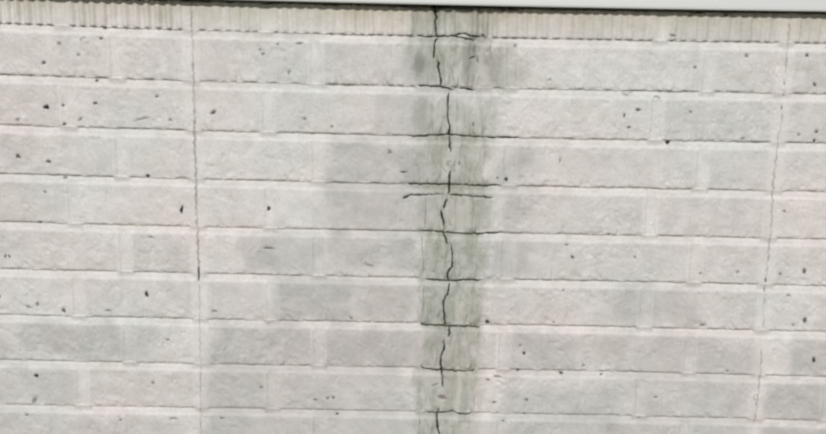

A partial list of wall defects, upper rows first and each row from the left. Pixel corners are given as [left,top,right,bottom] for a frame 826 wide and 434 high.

crack [406,5,518,387]
crack [419,408,471,434]